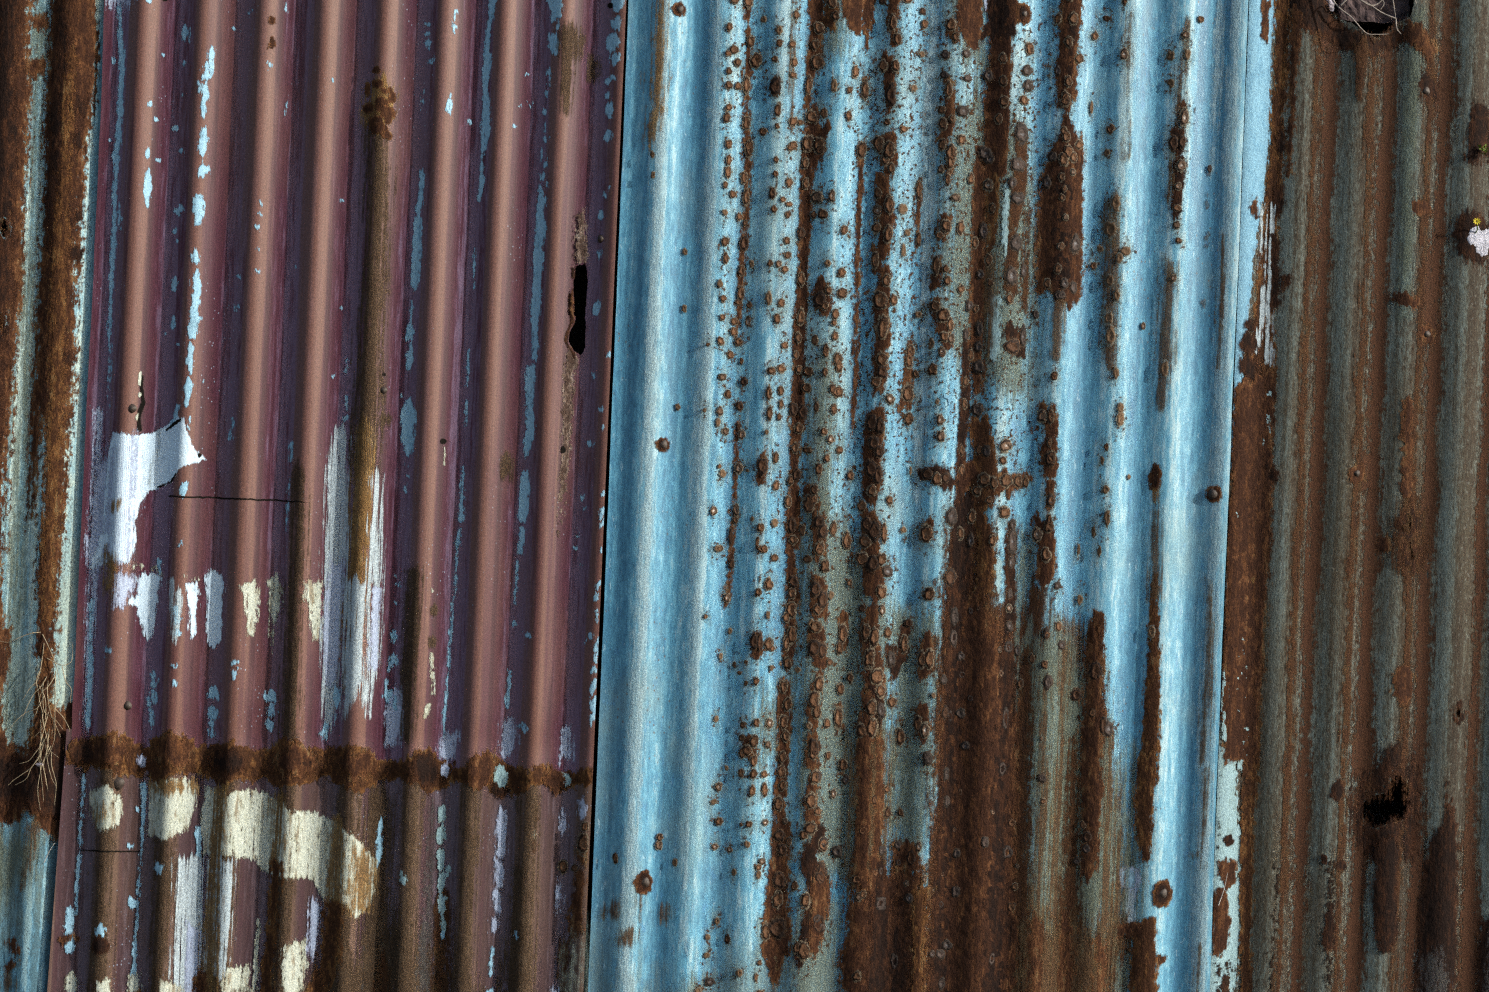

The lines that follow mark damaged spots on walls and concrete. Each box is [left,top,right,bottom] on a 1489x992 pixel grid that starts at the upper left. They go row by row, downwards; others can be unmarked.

peeling [89,0,152,521]
peeling [147,46,215,430]
corrosion [556,21,602,116]
corrosion [1161,15,1204,291]
corrosion [0,0,593,992]
corrosion [694,0,1173,992]
corrosion [1204,0,1489,992]
peeling [82,568,112,732]
peeling [65,774,86,954]
peeling [127,781,163,977]
peeling [375,816,385,868]
corrosion [655,833,678,867]